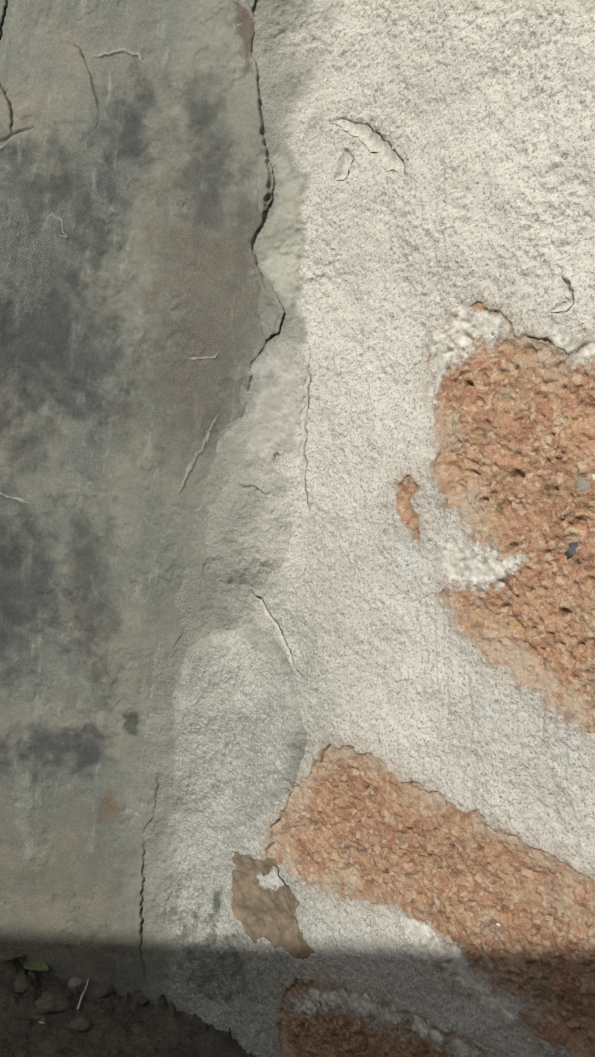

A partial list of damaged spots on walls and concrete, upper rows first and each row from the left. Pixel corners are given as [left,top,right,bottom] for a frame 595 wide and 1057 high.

crack [0,0,8,40]
crack [0,85,34,142]
damp [0,180,106,404]
spalling [397,476,419,539]
damp [123,712,138,734]
spalling [231,852,315,960]